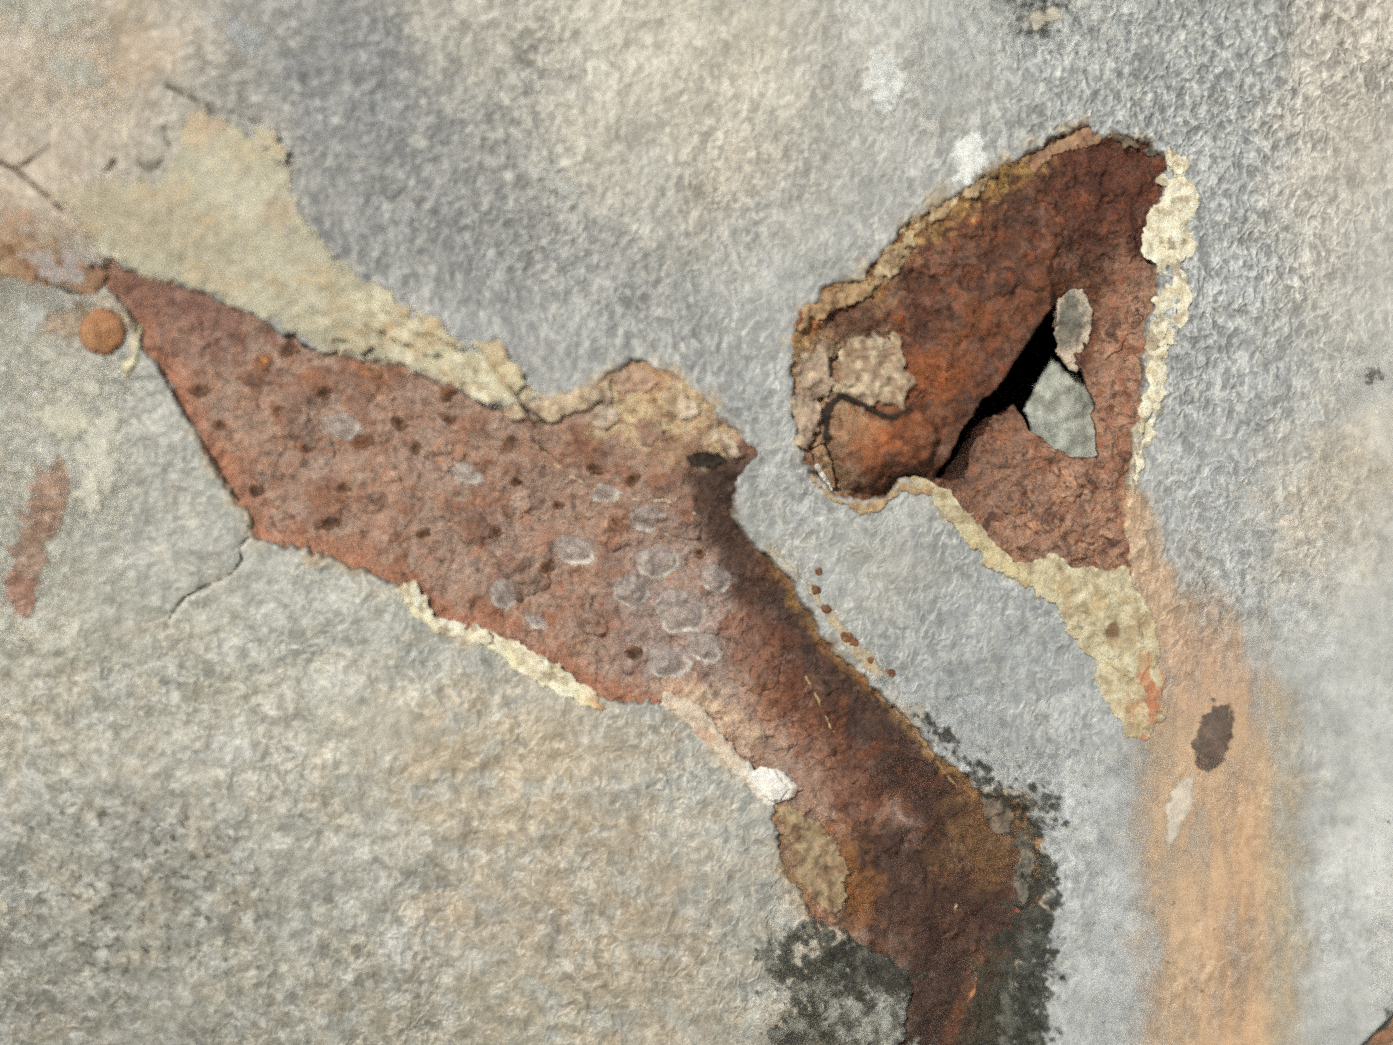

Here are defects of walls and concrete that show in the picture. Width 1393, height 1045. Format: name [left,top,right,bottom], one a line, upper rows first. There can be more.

crack [0,143,65,214]
peeling [19,109,540,415]
peeling [531,166,576,196]
peeling [951,132,992,186]
peeling [0,324,141,519]
crack [157,366,250,627]
peeling [392,580,606,710]
corrosion [0,205,1044,1045]
peeling [767,546,896,683]
peeling [910,476,1167,741]
corrosion [790,125,1296,1045]
peeling [660,691,803,807]